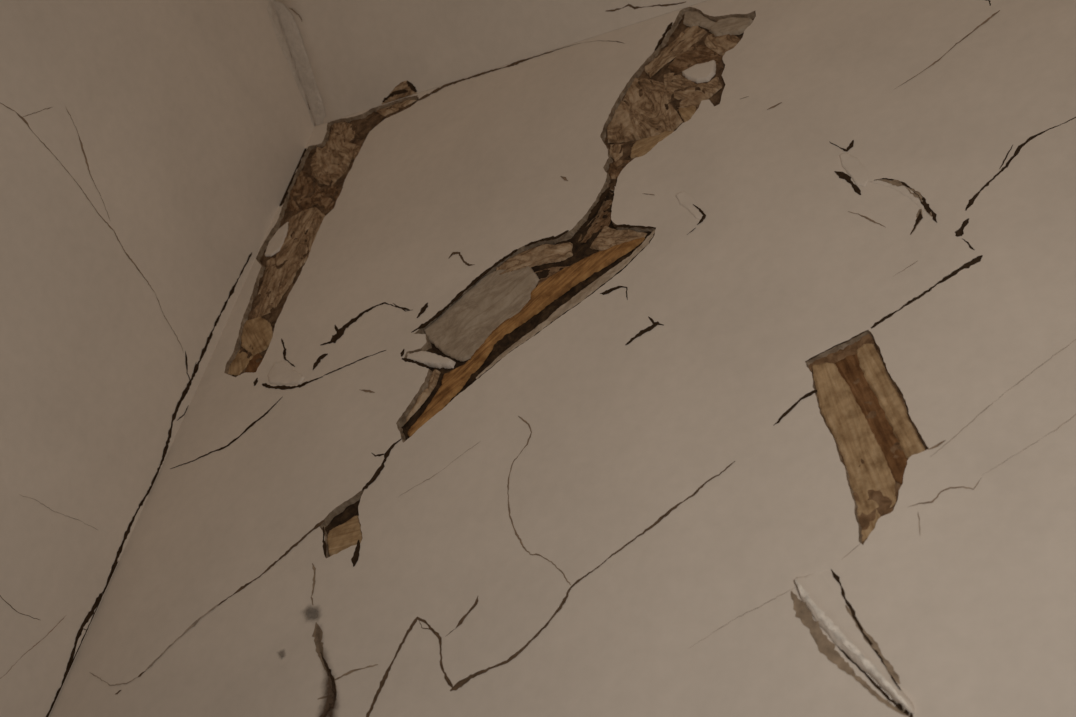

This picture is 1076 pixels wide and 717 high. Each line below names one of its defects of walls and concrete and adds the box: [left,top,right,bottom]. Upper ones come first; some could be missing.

flaking render [224,80,419,385]
flaking render [396,7,756,442]
crack [871,117,1076,329]
flaking render [320,490,364,558]
crack [0,103,735,717]
crack [773,390,818,426]
flaking render [805,330,929,545]
crack [909,414,1076,534]
flaking render [791,569,914,717]